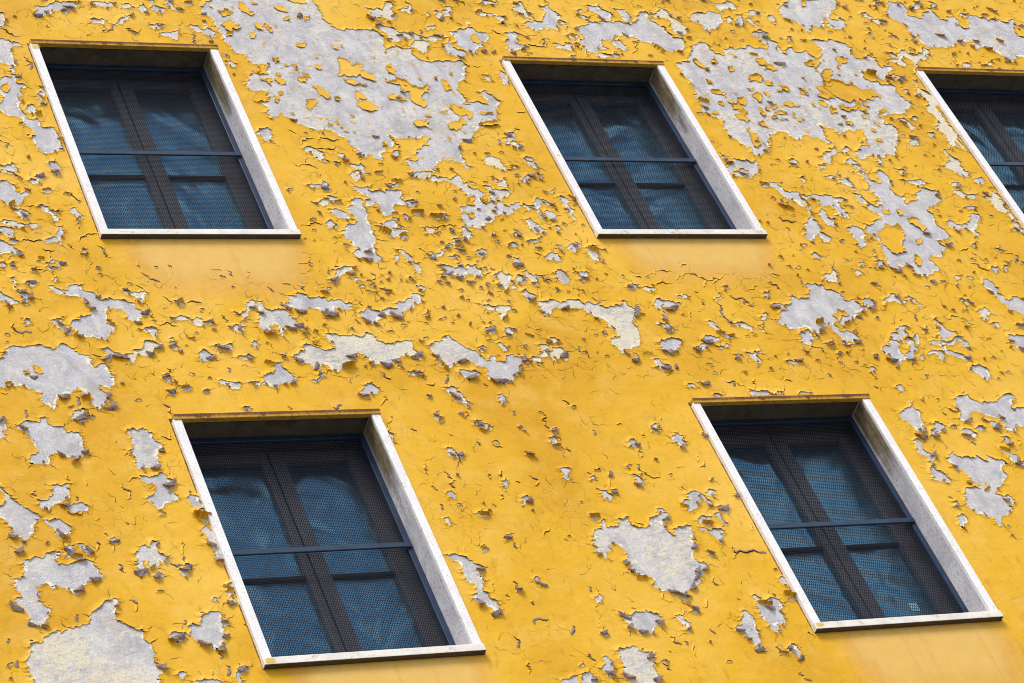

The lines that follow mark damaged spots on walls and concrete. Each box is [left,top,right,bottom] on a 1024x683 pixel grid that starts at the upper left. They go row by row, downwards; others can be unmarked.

crack [0,111,1023,555]
peeling [0,0,1024,467]
peeling [891,382,1024,536]
peeling [0,480,251,683]
peeling [442,543,505,620]
crack [489,566,636,674]
peeling [554,462,742,683]